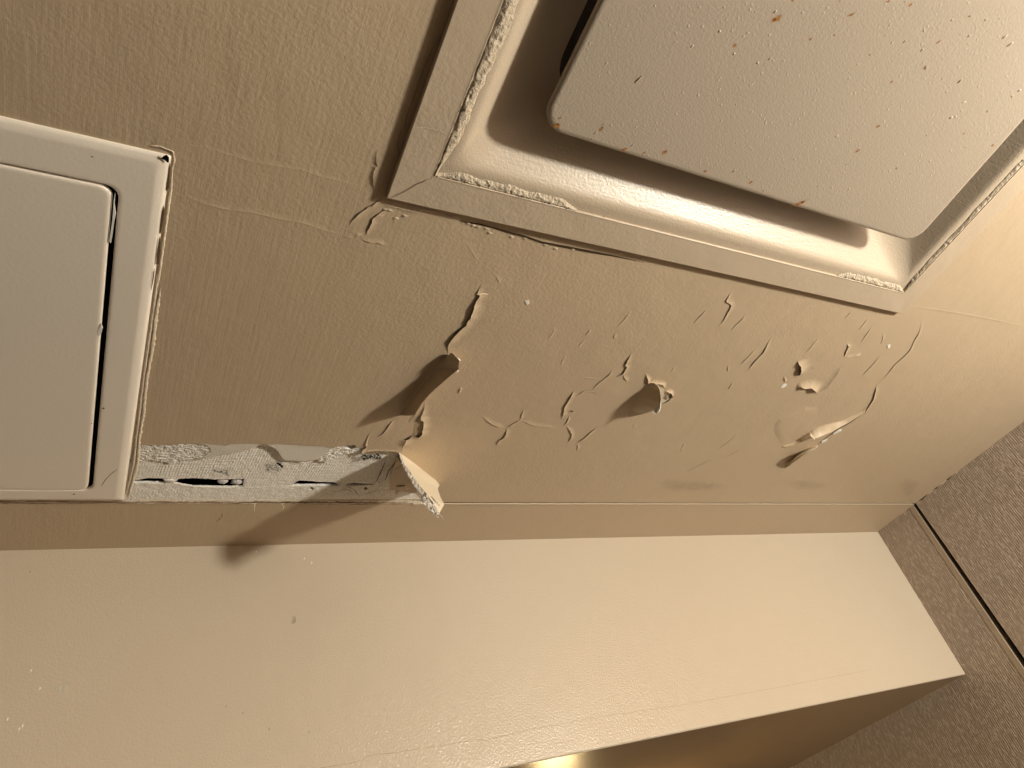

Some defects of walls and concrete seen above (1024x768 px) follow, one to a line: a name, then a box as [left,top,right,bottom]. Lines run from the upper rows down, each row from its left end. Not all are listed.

peeling [400,353,461,416]
peeling [628,372,675,418]
flaking render [123,433,423,503]